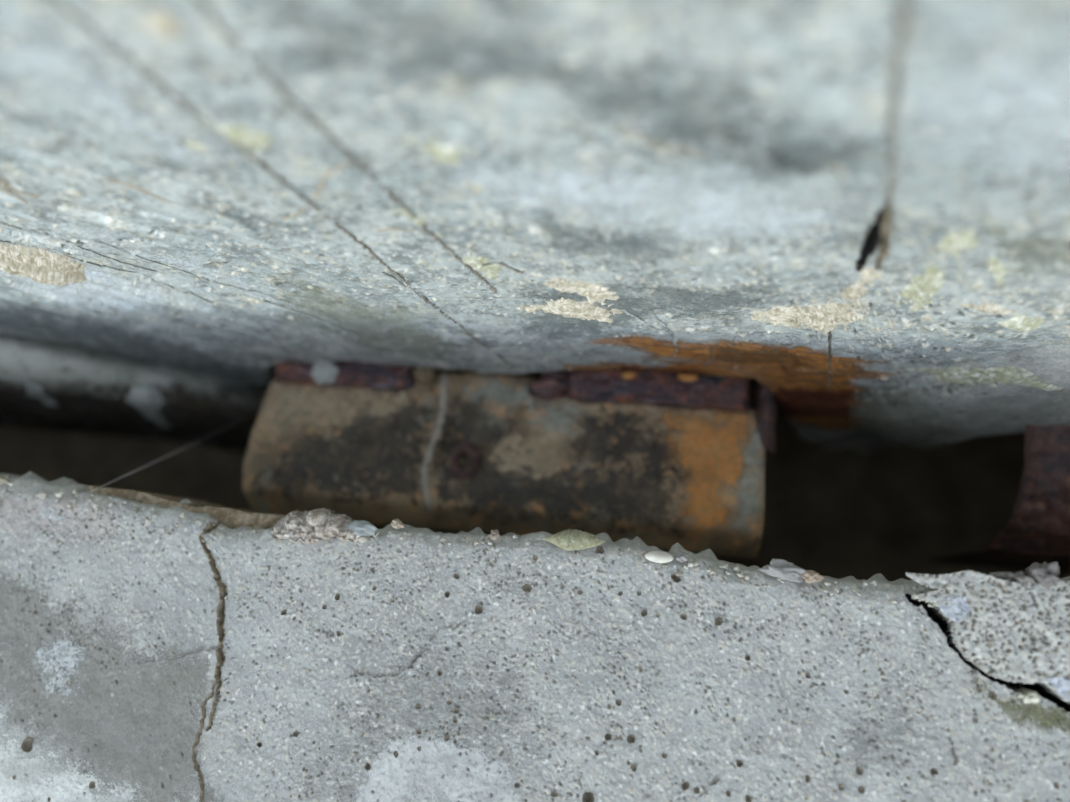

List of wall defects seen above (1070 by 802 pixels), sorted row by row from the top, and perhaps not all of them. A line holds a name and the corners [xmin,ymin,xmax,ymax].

crack [49,0,523,364]
crack [886,0,911,206]
corrosion [274,360,416,391]
corrosion [529,336,890,460]
corrosion [927,425,1070,573]
leakage [0,576,217,802]
crack [145,522,228,802]
crack [905,594,1070,713]